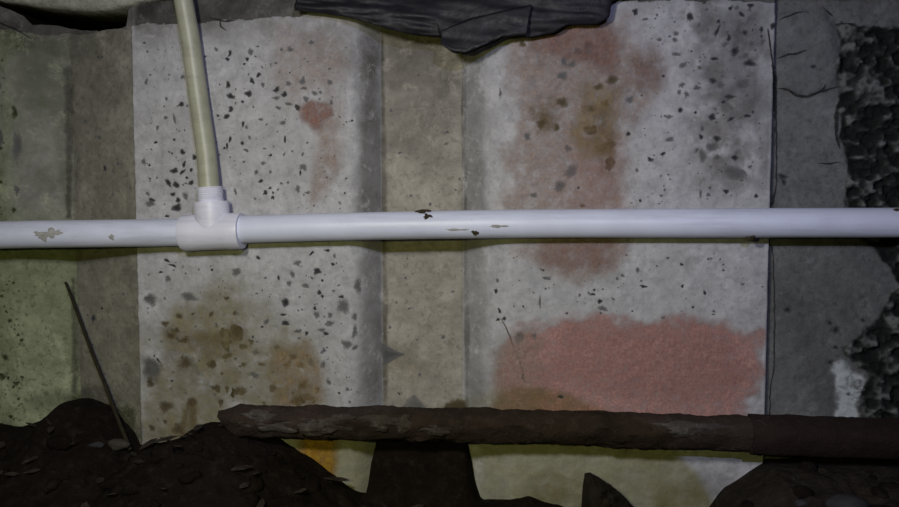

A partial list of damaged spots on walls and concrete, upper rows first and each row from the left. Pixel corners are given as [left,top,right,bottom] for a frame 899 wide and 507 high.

rust [300,101,333,144]
crack [768,8,843,206]
spalling [835,23,899,208]
rust [494,314,765,416]
spalling [833,238,899,418]